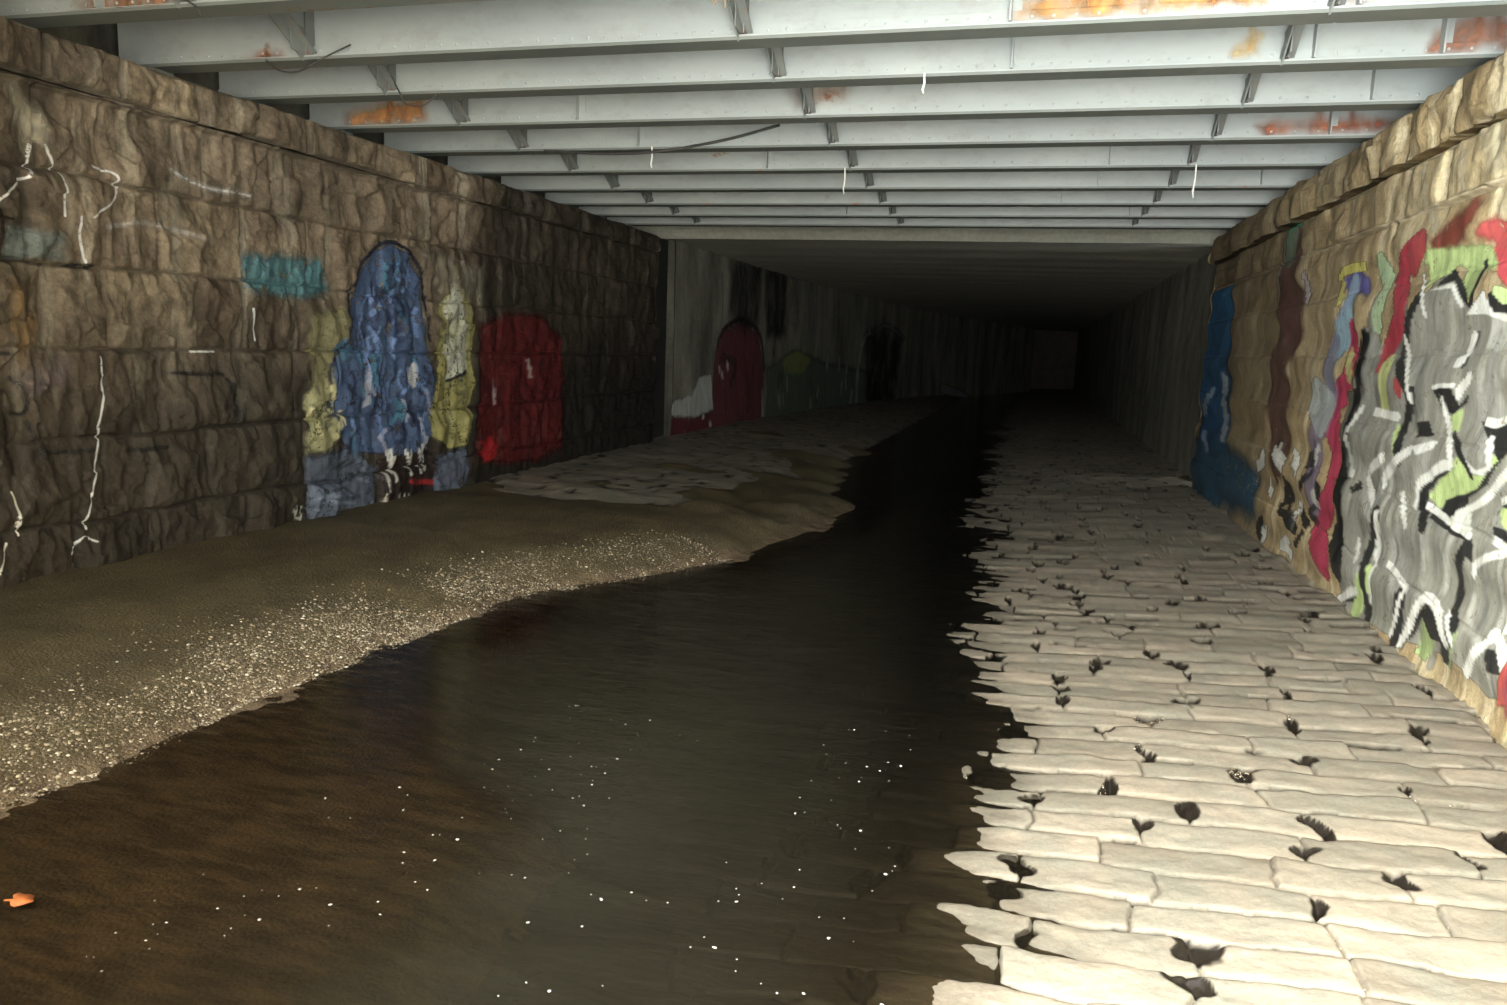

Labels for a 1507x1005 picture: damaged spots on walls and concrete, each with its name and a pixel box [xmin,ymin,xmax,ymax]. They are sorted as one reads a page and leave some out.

rust [1029,0,1251,18]
rust [1428,17,1507,53]
rust [351,101,424,125]